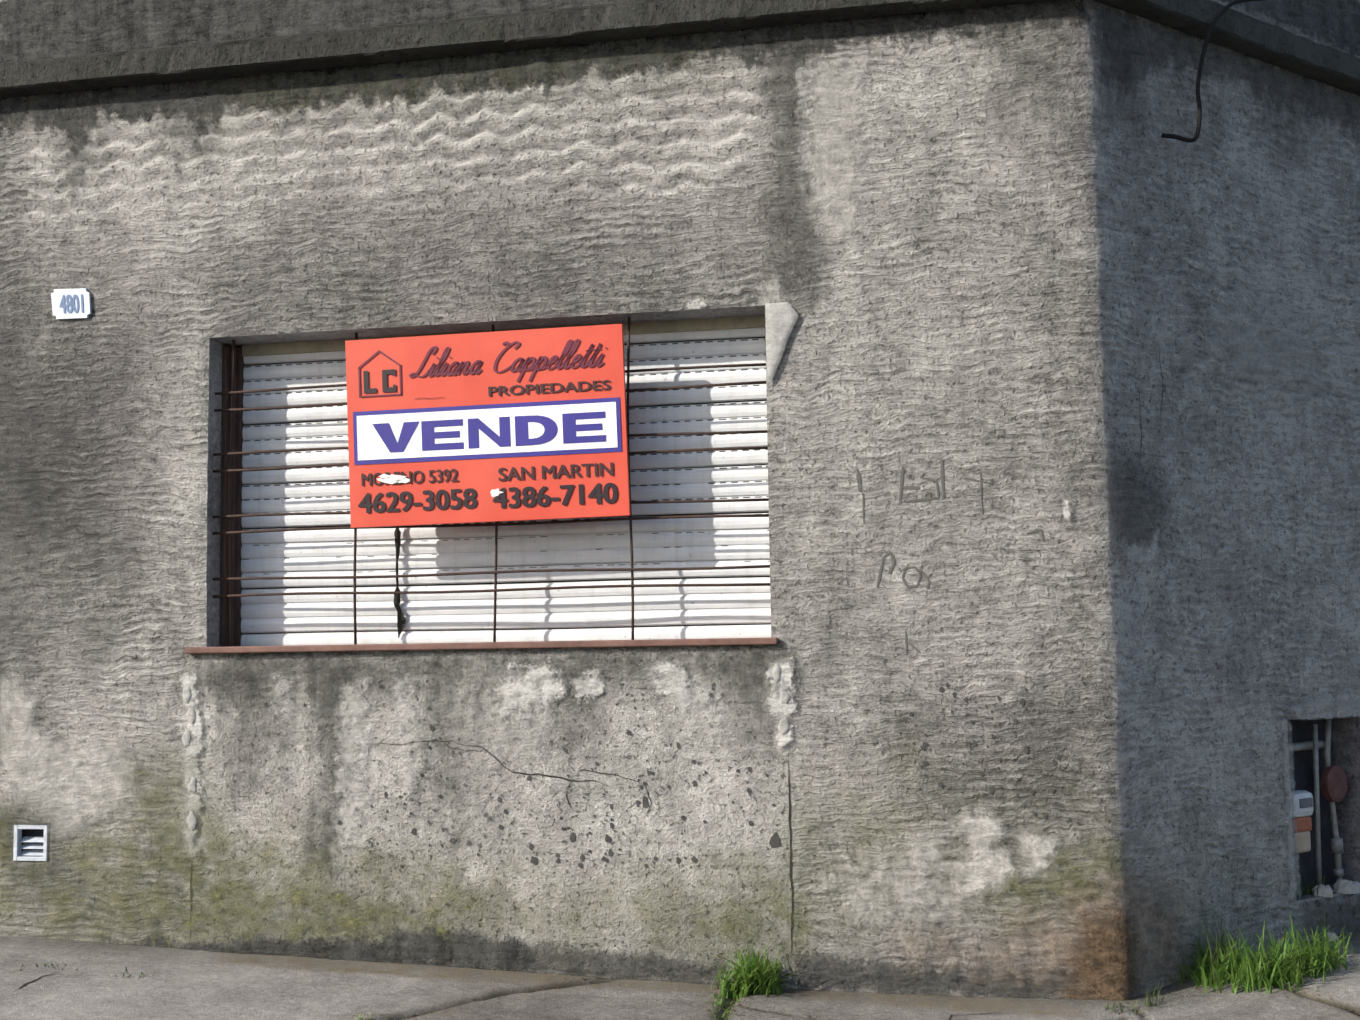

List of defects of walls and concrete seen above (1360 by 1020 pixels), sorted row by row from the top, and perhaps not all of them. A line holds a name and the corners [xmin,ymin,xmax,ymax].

damp [0,0,1360,310]
peeling [766,656,797,747]
crack [365,740,652,814]
damp [110,926,732,985]
damp [791,882,1186,1001]